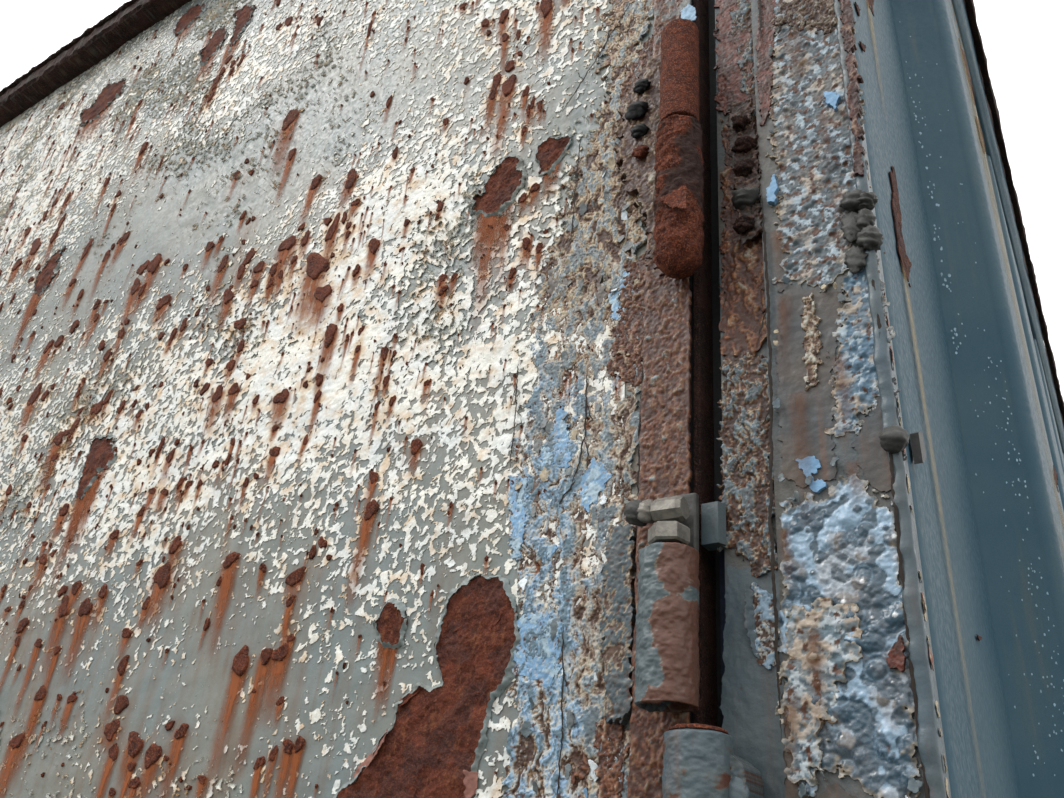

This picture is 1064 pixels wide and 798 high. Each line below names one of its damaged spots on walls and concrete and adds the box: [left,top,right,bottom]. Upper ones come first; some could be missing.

rust [454,0,567,154]
rust [574,0,635,33]
rust [437,273,458,308]
rust [467,134,572,292]
rust [0,0,444,798]
peeling [0,0,655,798]
rust [333,556,521,798]
peeling [905,776,923,798]